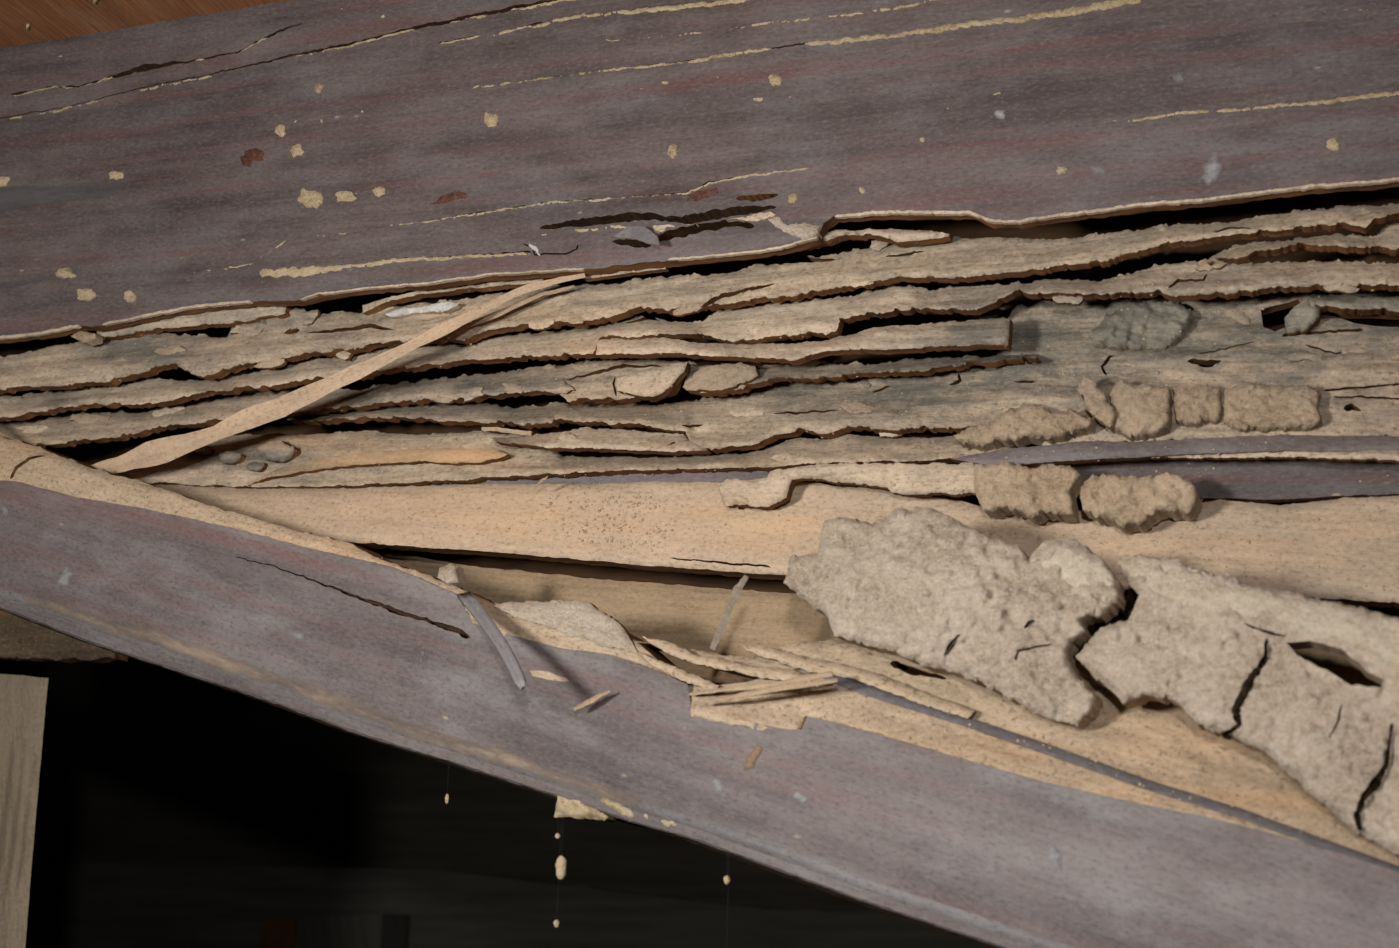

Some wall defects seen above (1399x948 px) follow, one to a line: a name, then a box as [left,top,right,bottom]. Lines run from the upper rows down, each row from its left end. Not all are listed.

crack [0,0,1142,120]
crack [1109,91,1399,122]
crack [205,167,822,278]
peeling [673,305,704,317]
peeling [431,388,485,404]
peeling [541,381,575,395]
peeling [616,362,764,417]
peeling [248,448,511,486]
peeling [557,432,603,457]
peeling [718,453,976,510]
crack [237,557,468,639]
peeling [457,592,638,691]